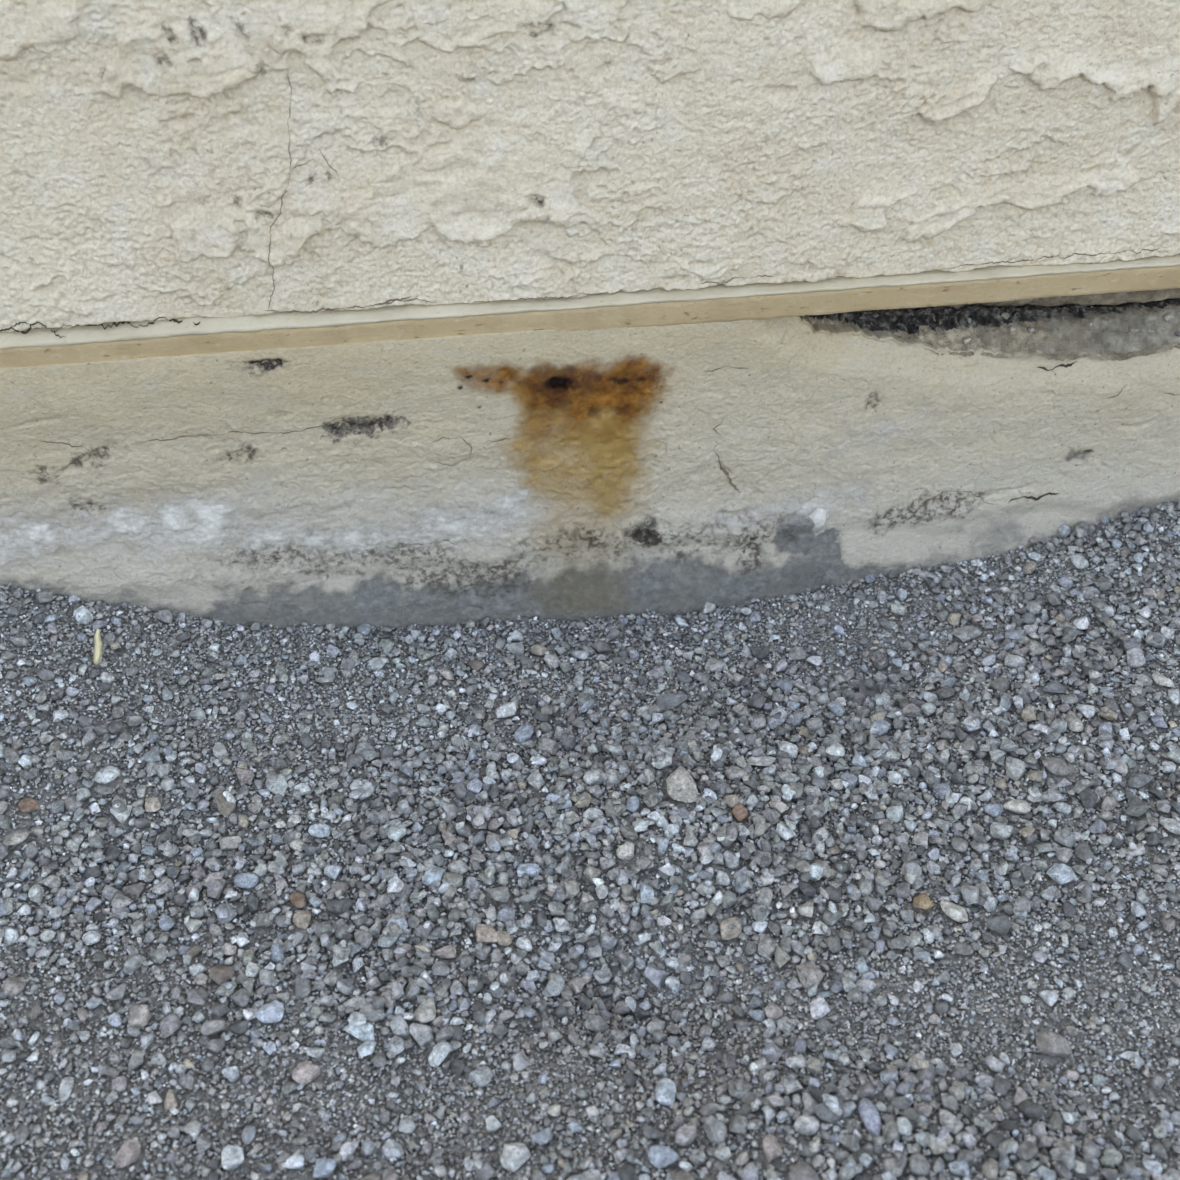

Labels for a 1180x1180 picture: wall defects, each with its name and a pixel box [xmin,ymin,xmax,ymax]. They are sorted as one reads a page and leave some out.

spalling [802,288,1180,361]
peeling [323,414,411,443]
corrosion [457,358,662,498]
water stain [710,494,837,526]
water stain [202,554,905,631]